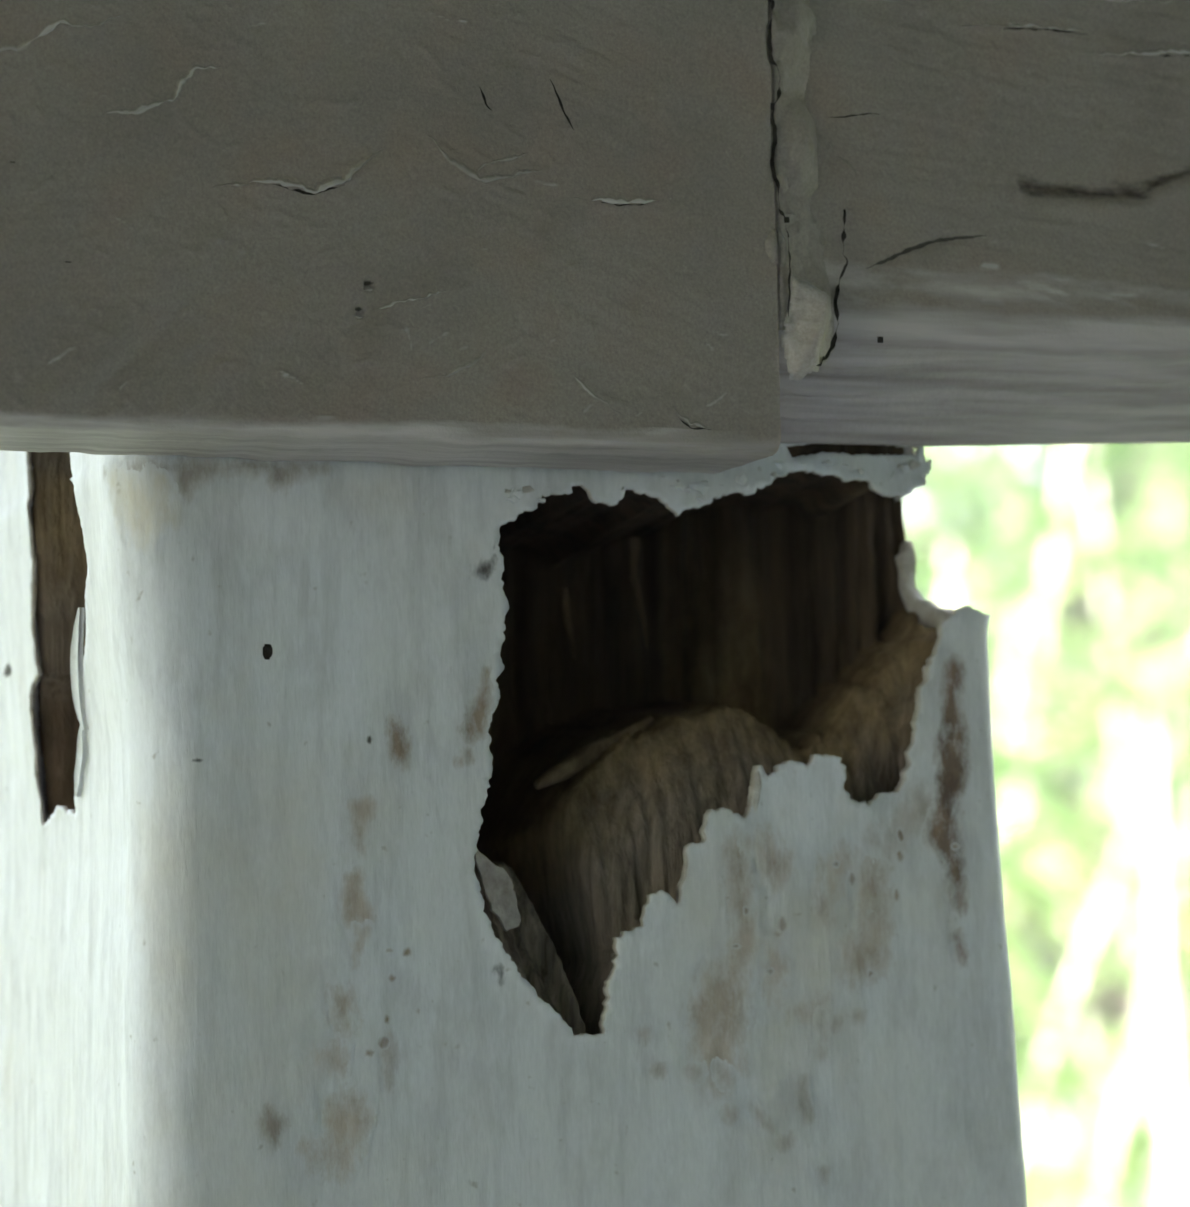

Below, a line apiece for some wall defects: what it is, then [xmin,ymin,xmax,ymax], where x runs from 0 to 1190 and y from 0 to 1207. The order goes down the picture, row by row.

crack [1022,175,1181,198]
crack [816,209,988,366]
peeling [474,849,521,932]
damp [633,772,934,1156]